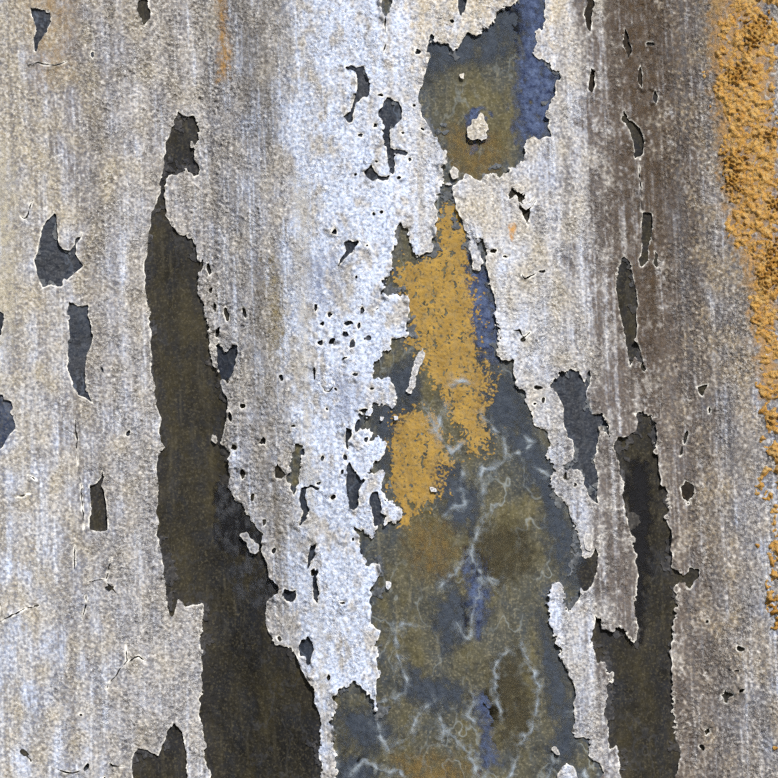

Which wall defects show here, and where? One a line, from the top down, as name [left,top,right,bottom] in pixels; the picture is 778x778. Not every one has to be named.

peeling [137,0,151,25]
peeling [34,214,83,287]
corrosion [702,0,778,630]
peeling [65,302,93,402]
peeling [0,395,15,449]
peeling [144,0,699,778]
peeling [88,472,108,535]
peeling [132,723,188,778]